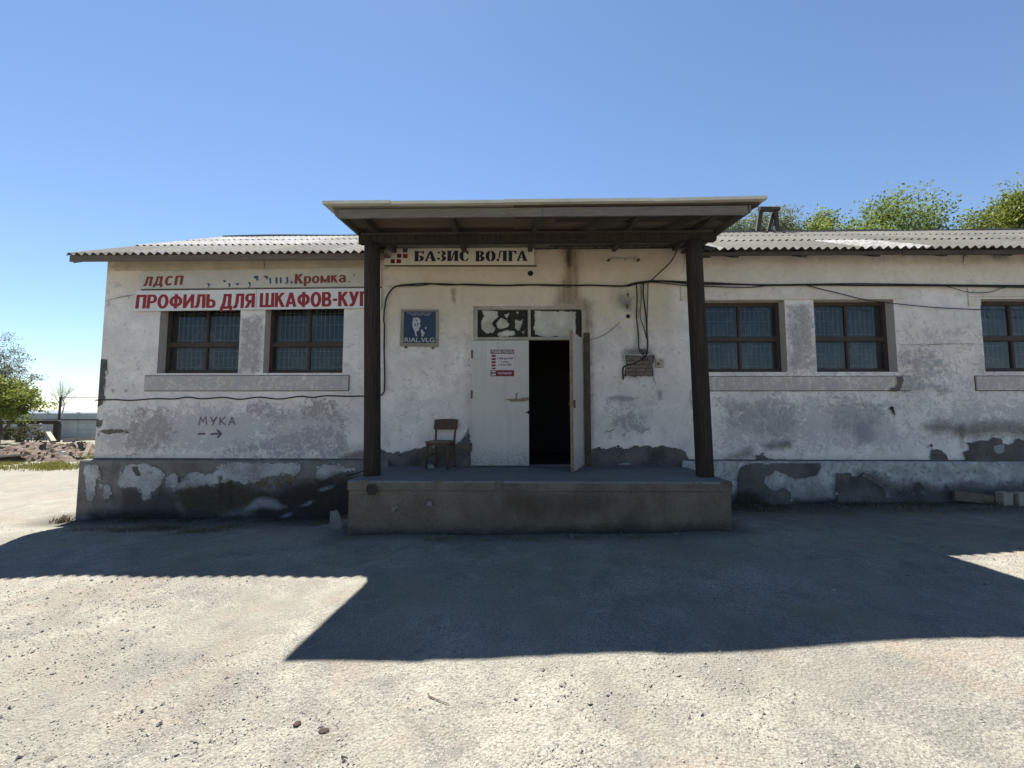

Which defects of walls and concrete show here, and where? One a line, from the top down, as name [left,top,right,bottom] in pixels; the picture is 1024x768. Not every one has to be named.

peeling [83,398,356,501]
spalling [381,428,471,466]
spalling [591,408,692,466]
spalling [964,437,1024,462]
spalling [736,453,821,504]
spalling [835,472,887,503]